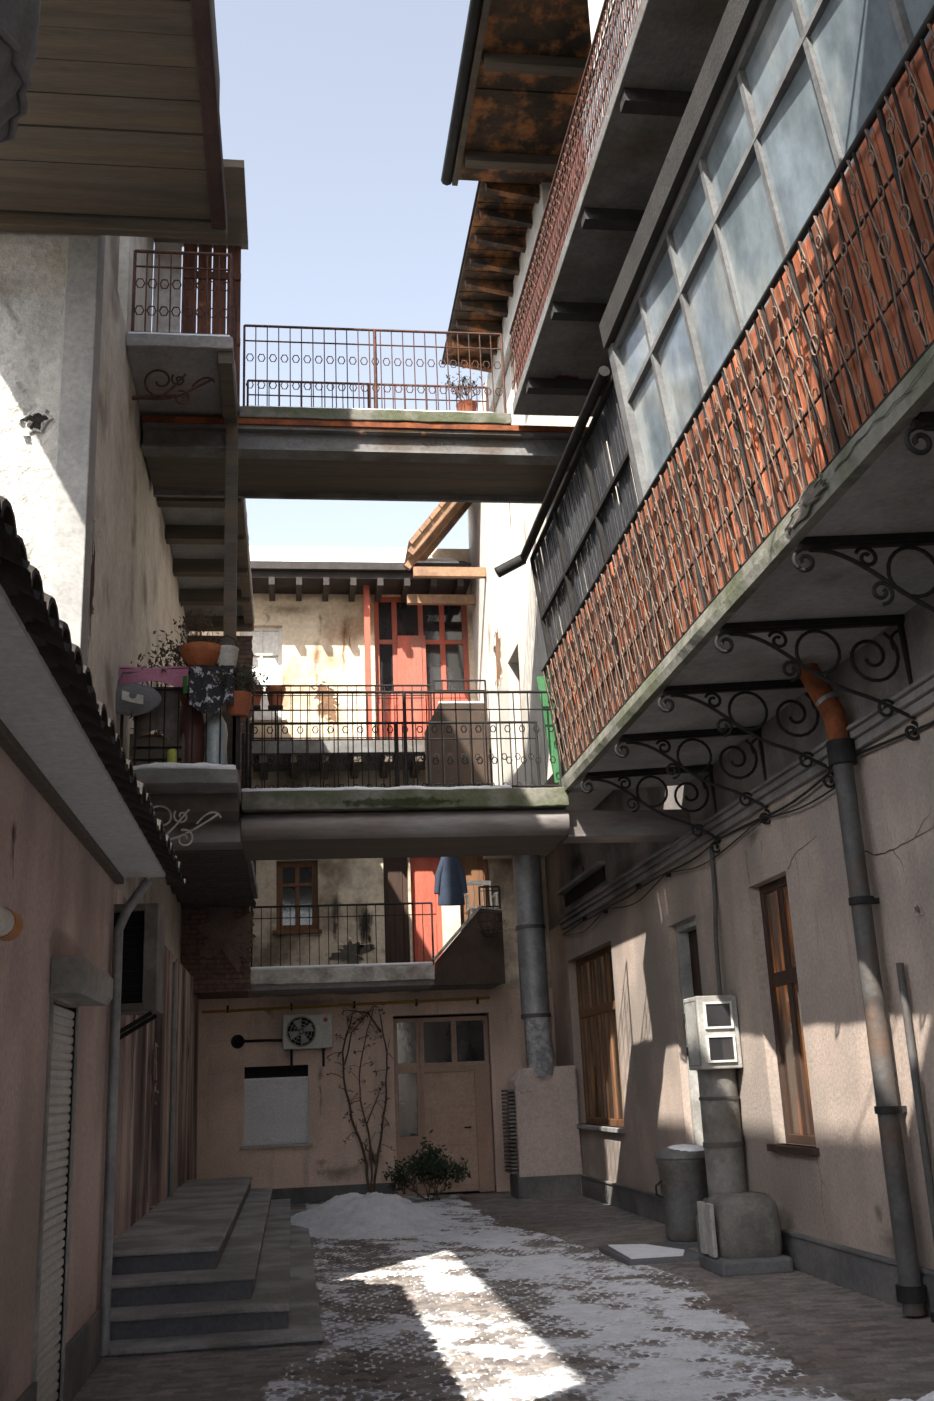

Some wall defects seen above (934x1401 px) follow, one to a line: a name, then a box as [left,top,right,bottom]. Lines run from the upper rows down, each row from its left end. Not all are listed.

flaking render [0,291,52,561]
crack [865,817,932,885]